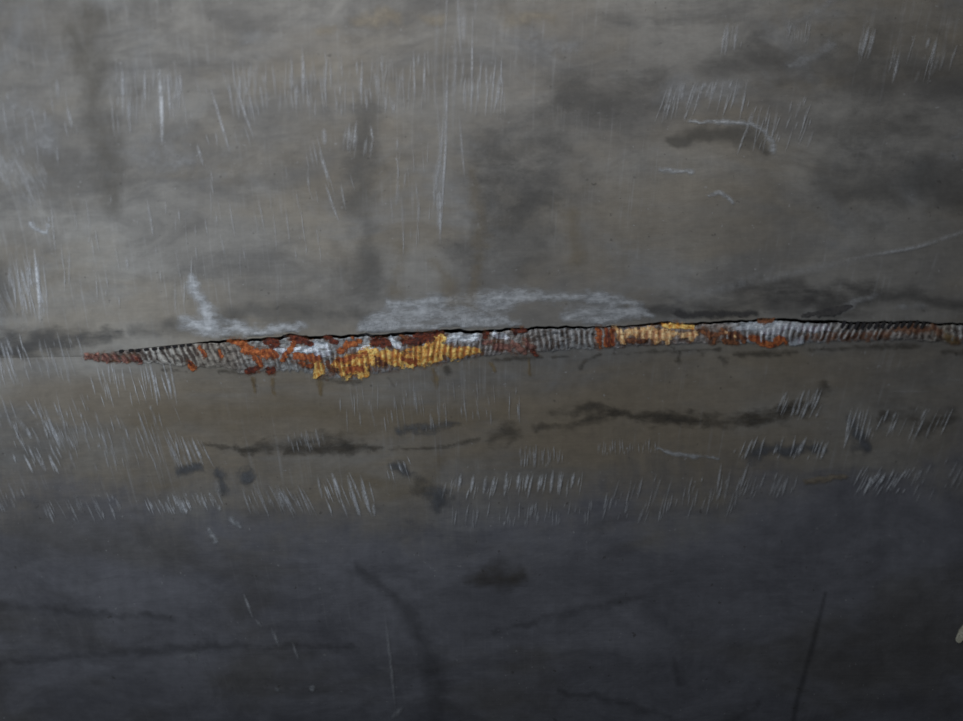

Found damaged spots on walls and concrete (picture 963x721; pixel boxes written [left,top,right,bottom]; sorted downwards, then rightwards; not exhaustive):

leakage [0,331,119,356]
rust [83,352,143,365]
leakage [183,276,303,336]
rust [188,327,539,395]
crack [119,305,963,353]
leakage [359,290,757,332]
rust [595,322,788,349]